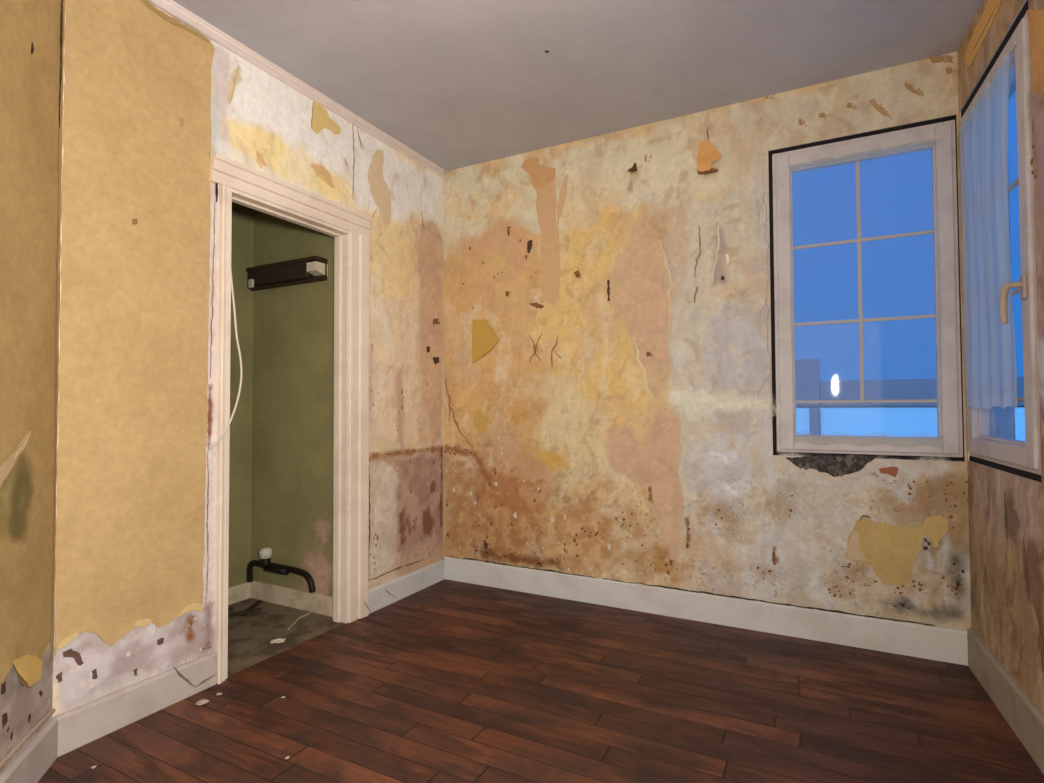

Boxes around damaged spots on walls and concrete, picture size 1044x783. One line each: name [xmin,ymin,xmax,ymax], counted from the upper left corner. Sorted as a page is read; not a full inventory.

peeling [697,141,722,174]
peeling [1027,85,1044,294]
spalling [779,454,914,484]
water stain [878,549,970,625]
spalling [0,611,215,748]